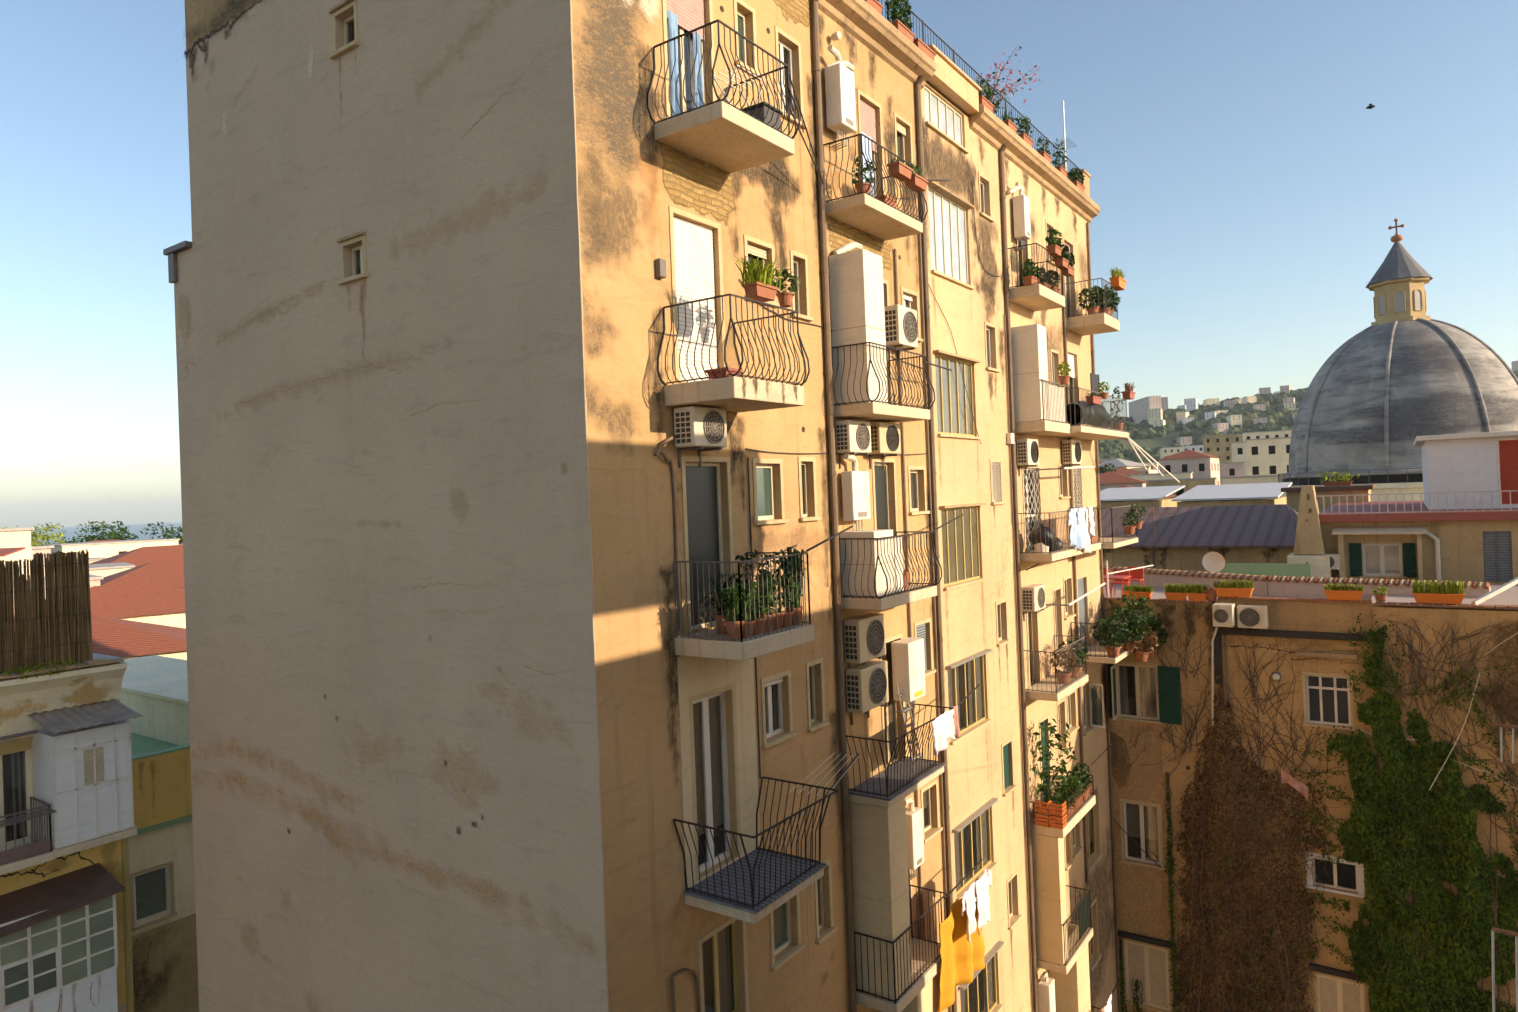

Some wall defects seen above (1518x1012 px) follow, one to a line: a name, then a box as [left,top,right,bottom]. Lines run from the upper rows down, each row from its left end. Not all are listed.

damp [186,0,253,75]
flaking render [774,0,810,27]
damp [844,30,874,80]
flaking render [660,143,735,226]
damp [731,77,818,291]
damp [1006,160,1077,232]